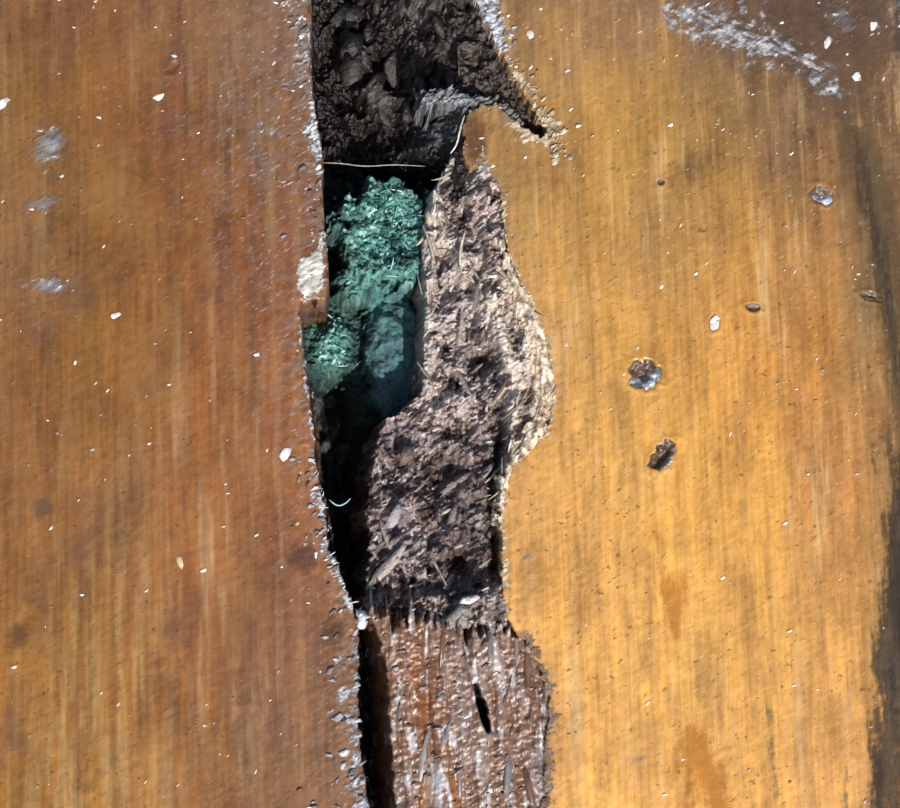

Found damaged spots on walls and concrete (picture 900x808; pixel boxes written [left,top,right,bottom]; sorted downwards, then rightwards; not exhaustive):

peeling [281,0,324,196]
crack [457,41,543,138]
leakage [841,119,900,409]
crack [314,393,364,587]
spalling [296,145,555,808]
crack [361,640,377,808]
crack [473,686,485,728]
leakage [867,461,900,808]